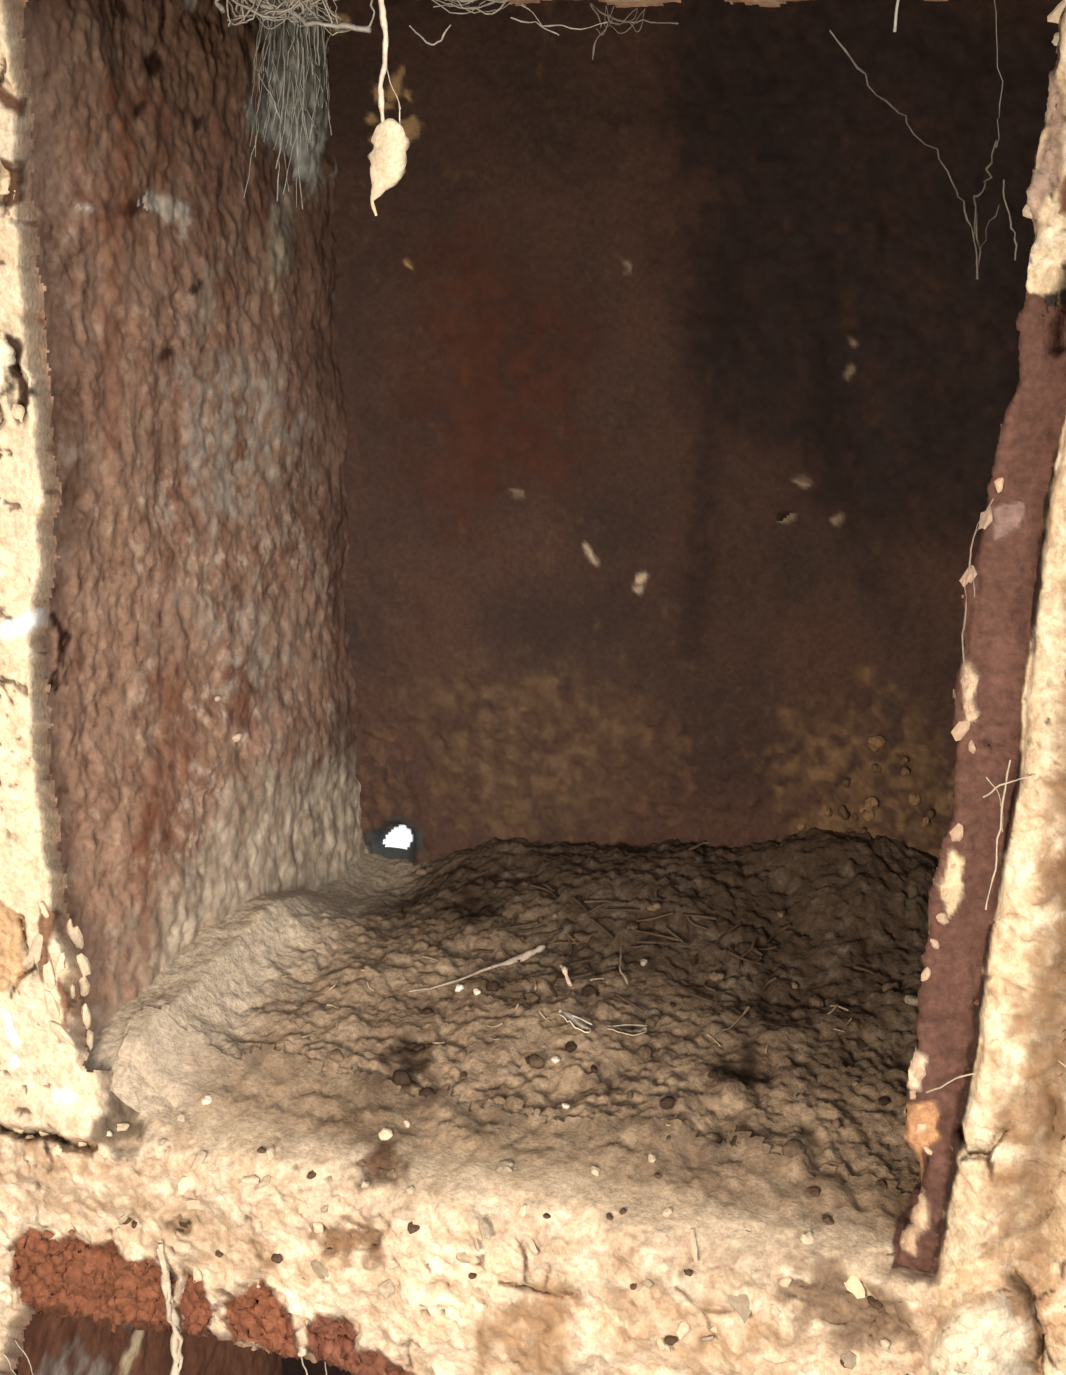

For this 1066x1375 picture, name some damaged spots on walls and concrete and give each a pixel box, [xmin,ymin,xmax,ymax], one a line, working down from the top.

flaking render [1023,0,1066,237]
peeling [0,902,94,1051]
crack [0,1125,91,1174]
crack [956,1131,1007,1175]